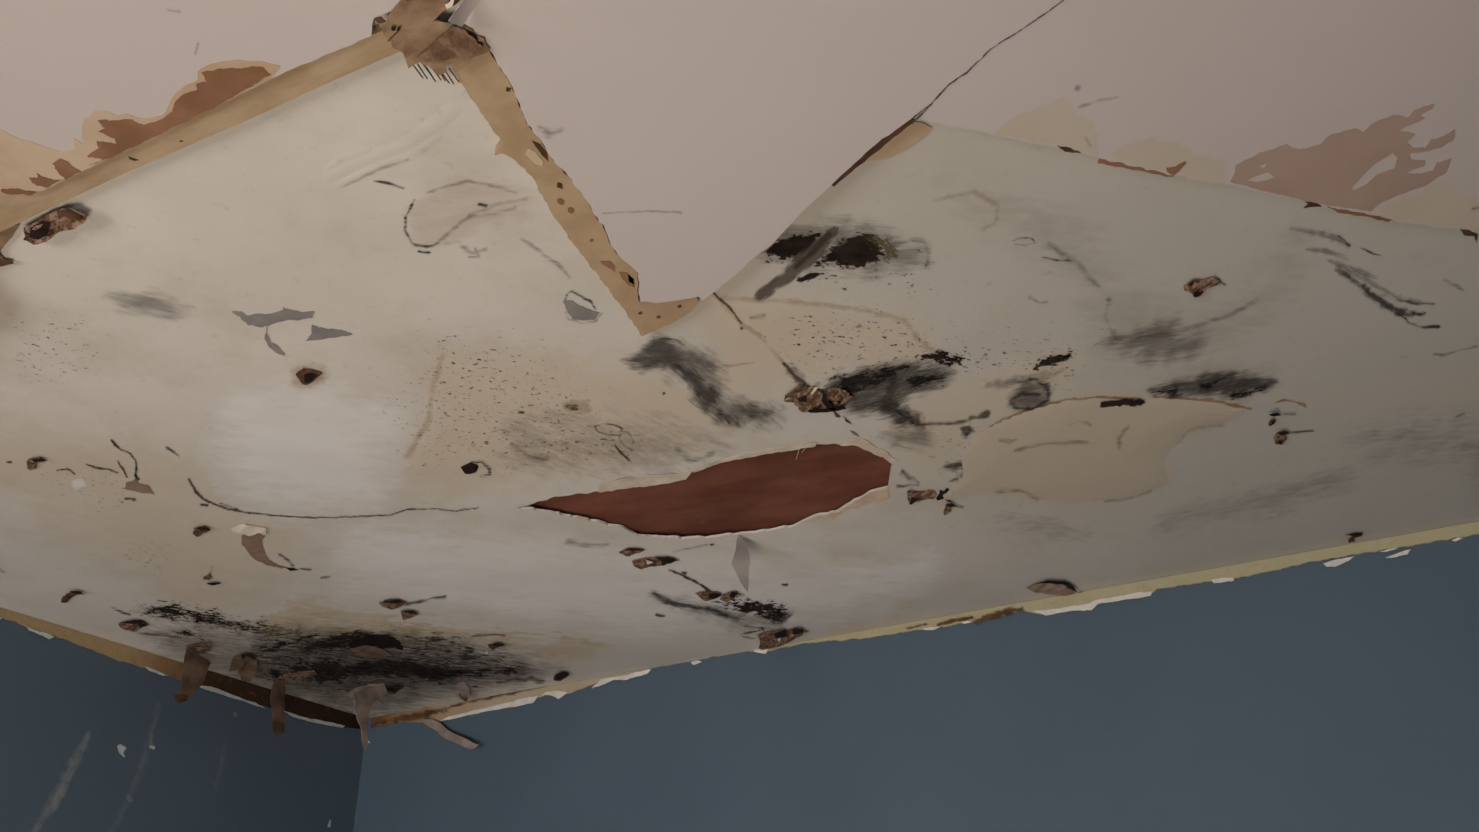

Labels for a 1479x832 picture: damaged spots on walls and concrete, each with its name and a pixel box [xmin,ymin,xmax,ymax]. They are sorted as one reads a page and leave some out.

crack [911,0,1064,124]
peeling [0,60,280,195]
peeling [992,96,1479,235]
crack [57,440,138,490]
peeling [124,476,155,501]
water stain [0,390,625,707]
crack [188,478,479,519]
peeling [165,365,957,665]
peeling [592,669,651,688]